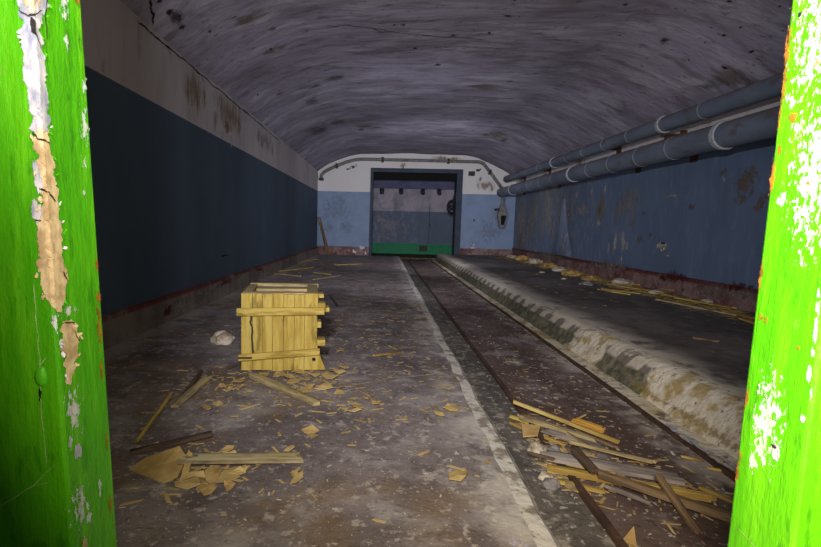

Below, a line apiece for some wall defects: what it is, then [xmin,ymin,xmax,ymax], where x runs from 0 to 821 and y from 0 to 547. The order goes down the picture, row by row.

spalling [17,0,83,460]
crack [138,0,278,140]
spalling [776,0,821,267]
spalling [749,363,787,475]